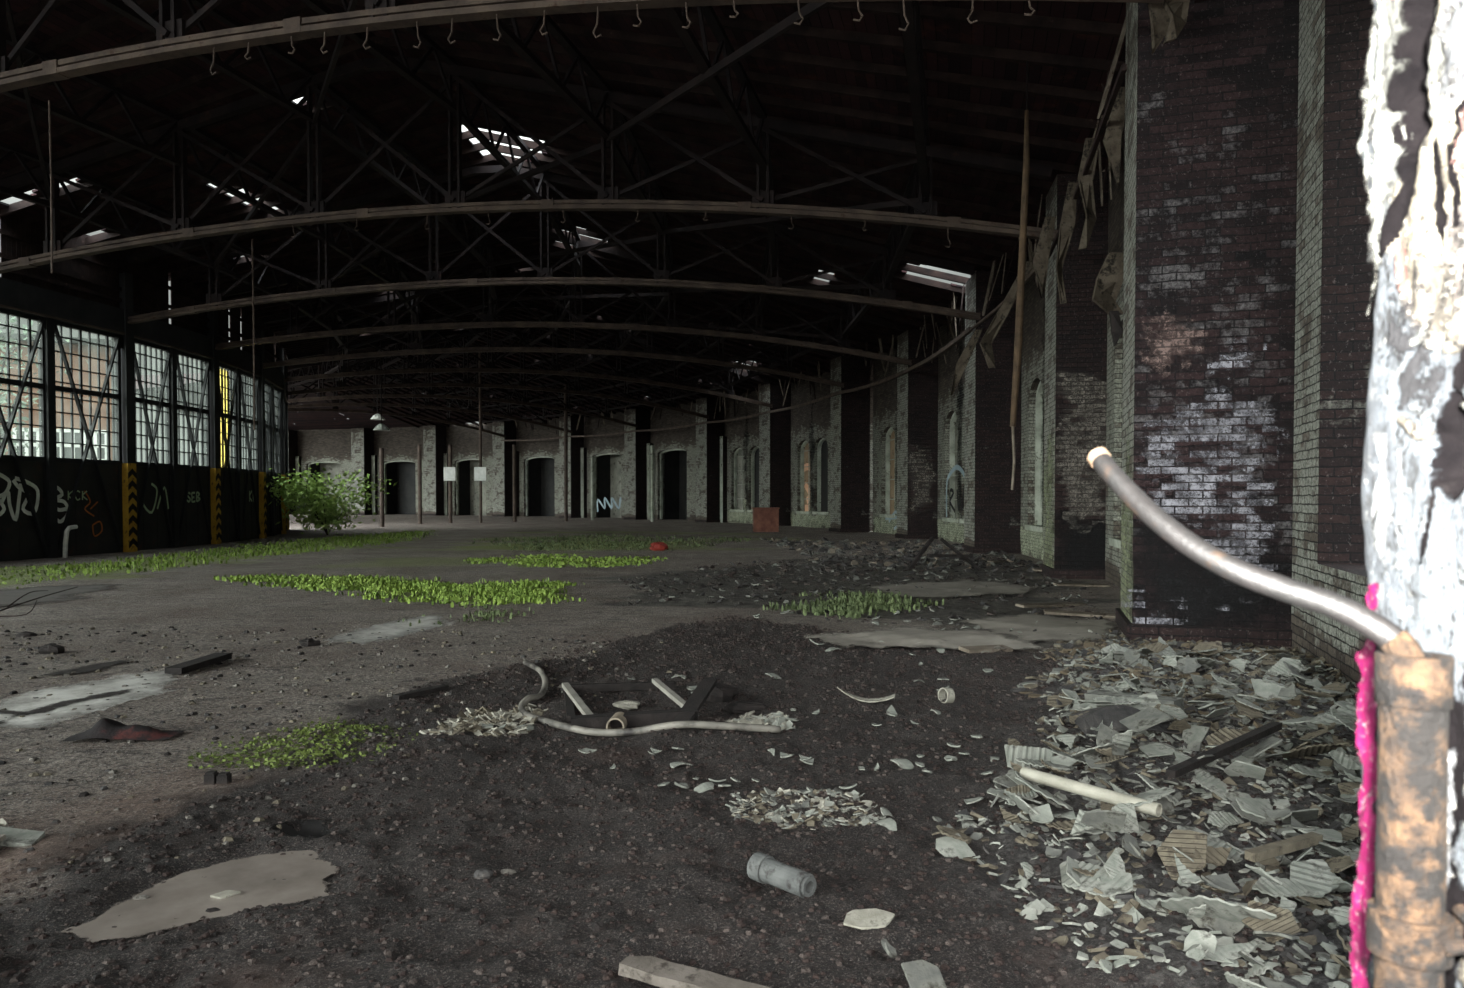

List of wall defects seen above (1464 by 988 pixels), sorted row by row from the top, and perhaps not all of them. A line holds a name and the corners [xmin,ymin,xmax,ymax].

flaking render [1381,0,1464,565]